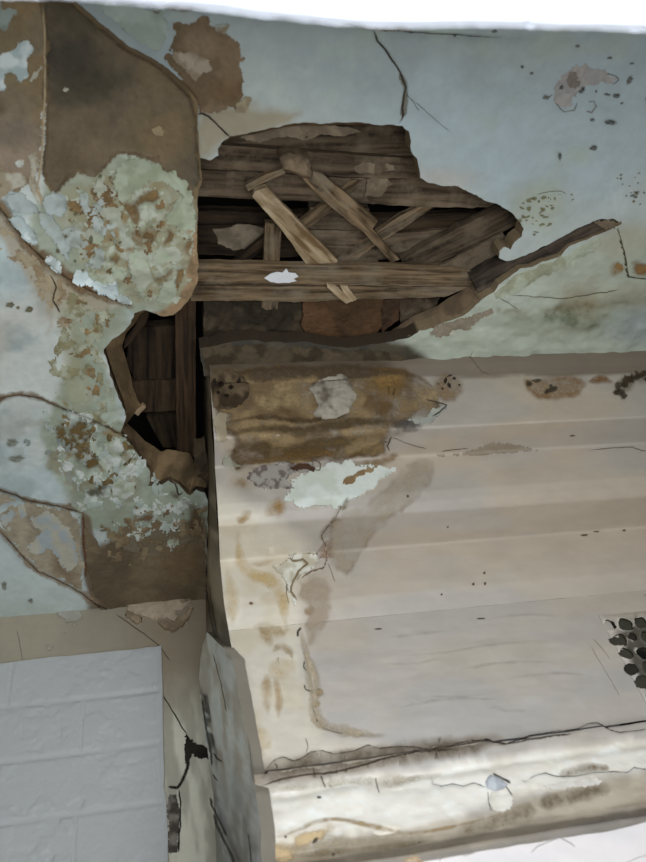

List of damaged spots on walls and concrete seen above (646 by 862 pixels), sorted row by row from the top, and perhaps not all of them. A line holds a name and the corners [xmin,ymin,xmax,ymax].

crack [353,26,482,129]
flaking render [225,122,401,142]
flaking render [0,0,253,491]
crack [0,391,118,433]
water stain [211,365,460,469]
peeling [222,454,396,509]
crack [0,489,170,660]
flaking render [0,494,208,633]
crack [163,589,252,862]
water stain [304,652,364,737]
crack [268,661,645,793]
water stain [275,818,415,862]